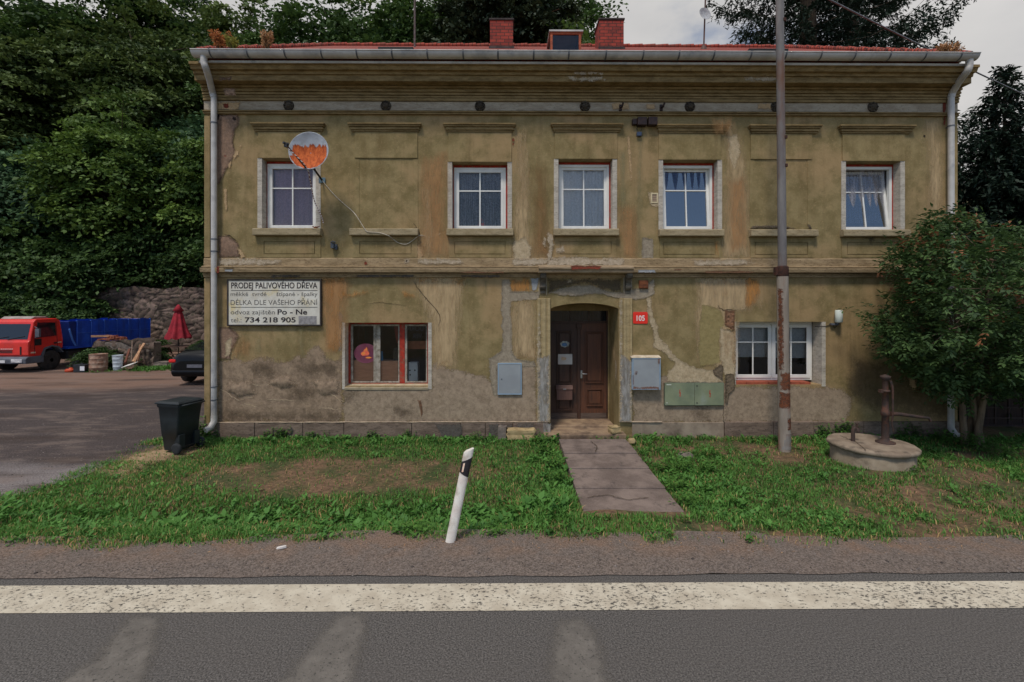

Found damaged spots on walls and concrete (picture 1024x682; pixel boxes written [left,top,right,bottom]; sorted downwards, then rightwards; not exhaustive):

spalling [217,76,241,210]
flaking render [217,277,551,422]
flaking render [613,258,852,422]